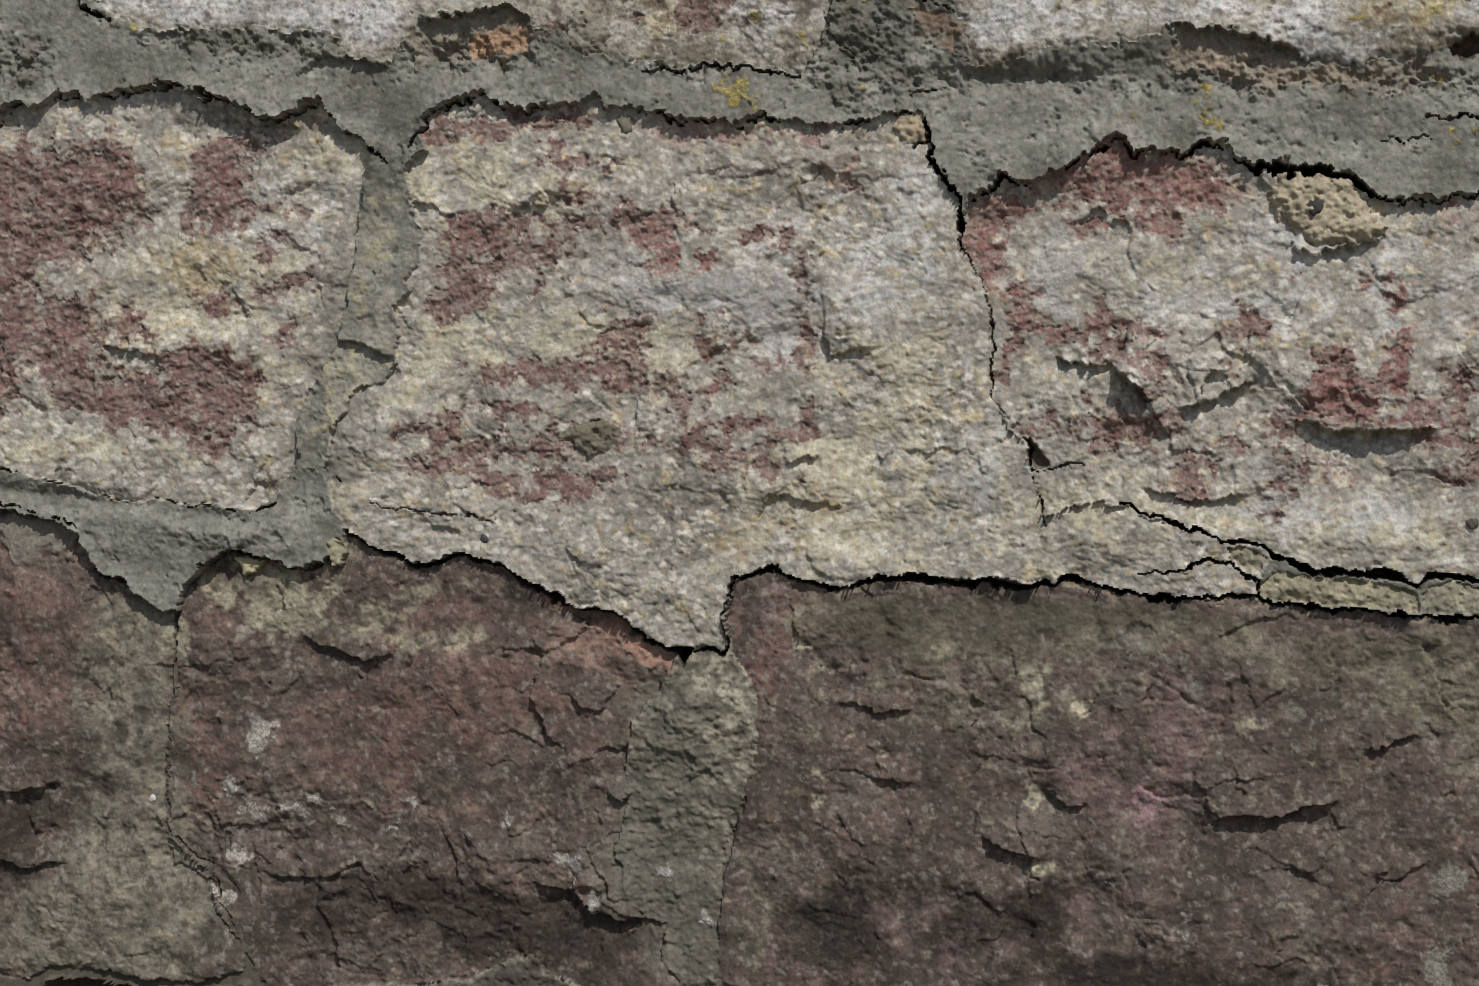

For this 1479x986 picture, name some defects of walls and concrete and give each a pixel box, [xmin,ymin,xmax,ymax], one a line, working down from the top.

crack [0,80,543,165]
crack [641,61,801,130]
crack [1380,112,1479,145]
crack [1064,137,1479,208]
crack [843,86,1085,527]
crack [0,466,76,528]
crack [163,499,277,513]
crack [93,567,127,585]
peeling [235,555,267,576]
peeling [326,537,349,567]
crack [195,475,1479,658]
spalling [542,596,680,678]